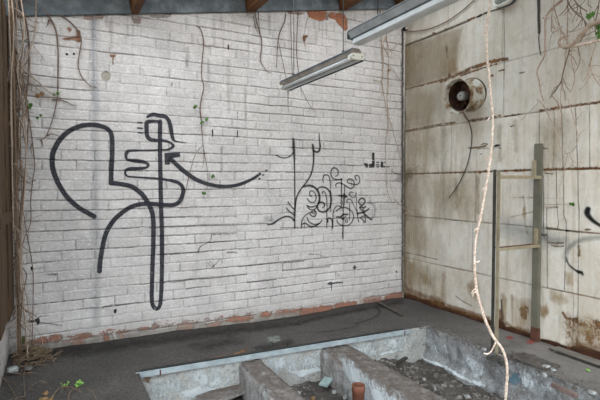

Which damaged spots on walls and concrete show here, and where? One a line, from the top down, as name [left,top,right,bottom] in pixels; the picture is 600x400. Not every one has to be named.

peeling [288,11,348,31]
corrosion [406,57,509,90]
peeling [24,292,402,349]
corrosion [499,299,530,338]
corrosion [540,312,600,360]